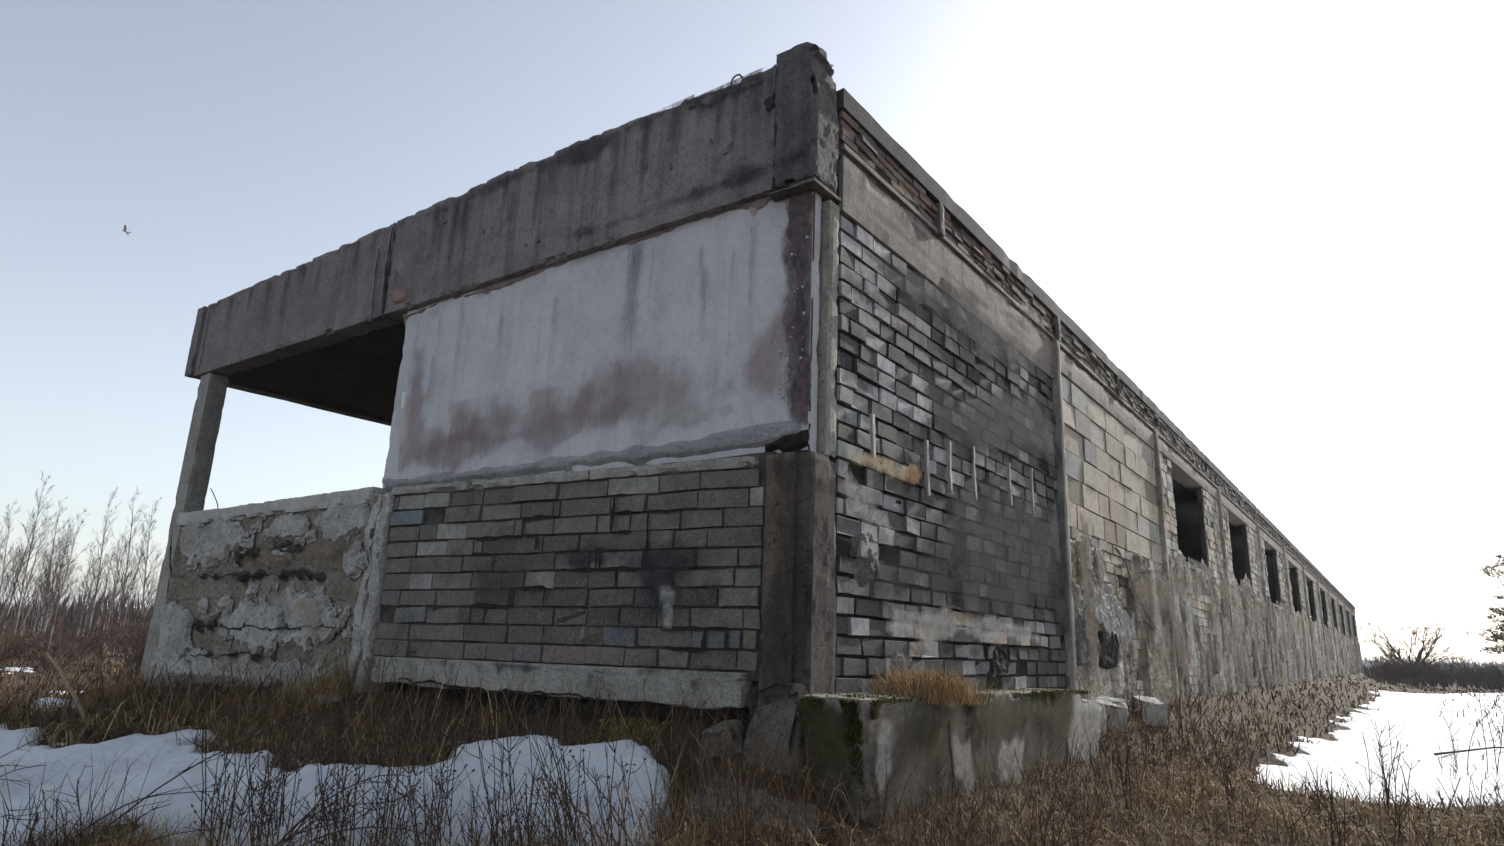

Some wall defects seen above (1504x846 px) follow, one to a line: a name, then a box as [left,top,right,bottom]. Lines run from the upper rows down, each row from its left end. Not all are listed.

leakage [420,68,773,239]
peeling [180,503,370,581]
peeling [145,581,354,689]
leakage [876,698,1100,827]